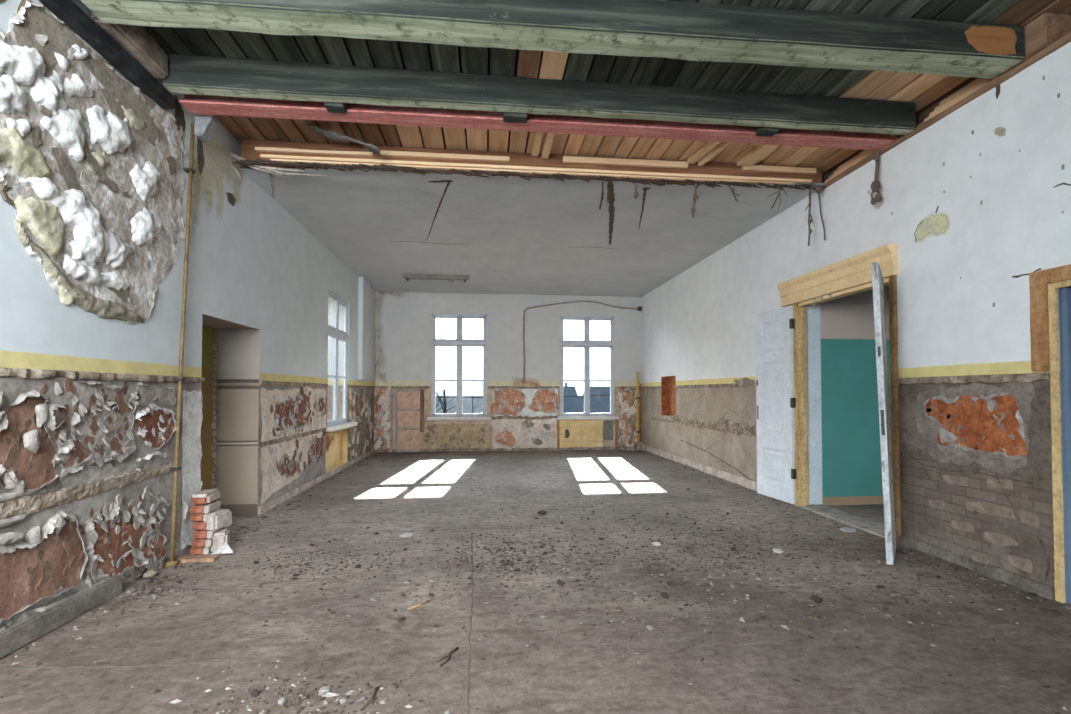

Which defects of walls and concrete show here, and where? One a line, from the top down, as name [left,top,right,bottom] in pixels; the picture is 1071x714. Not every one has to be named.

peeling [0,0,187,324]
damp [914,206,949,242]
peeling [0,379,177,495]
peeling [260,386,327,504]
flaking render [422,387,560,449]
spalling [669,415,755,436]
spalling [923,392,1027,459]
peeling [0,486,189,632]